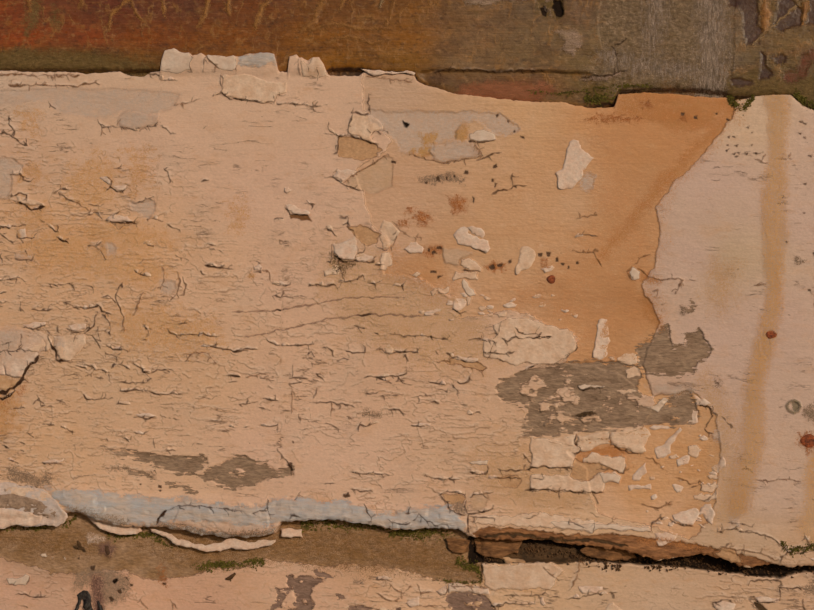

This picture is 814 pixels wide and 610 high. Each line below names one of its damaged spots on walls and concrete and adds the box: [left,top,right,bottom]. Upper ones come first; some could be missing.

crack [11,173,151,258]
peeling [285,200,315,221]
crack [0,224,21,311]
crack [42,269,178,404]
crack [169,322,471,431]
crack [273,276,376,298]
crack [474,333,511,361]
peeling [324,69,772,567]
peeling [102,445,295,495]
crack [329,471,382,498]
peeling [0,482,564,610]
crack [718,528,811,561]